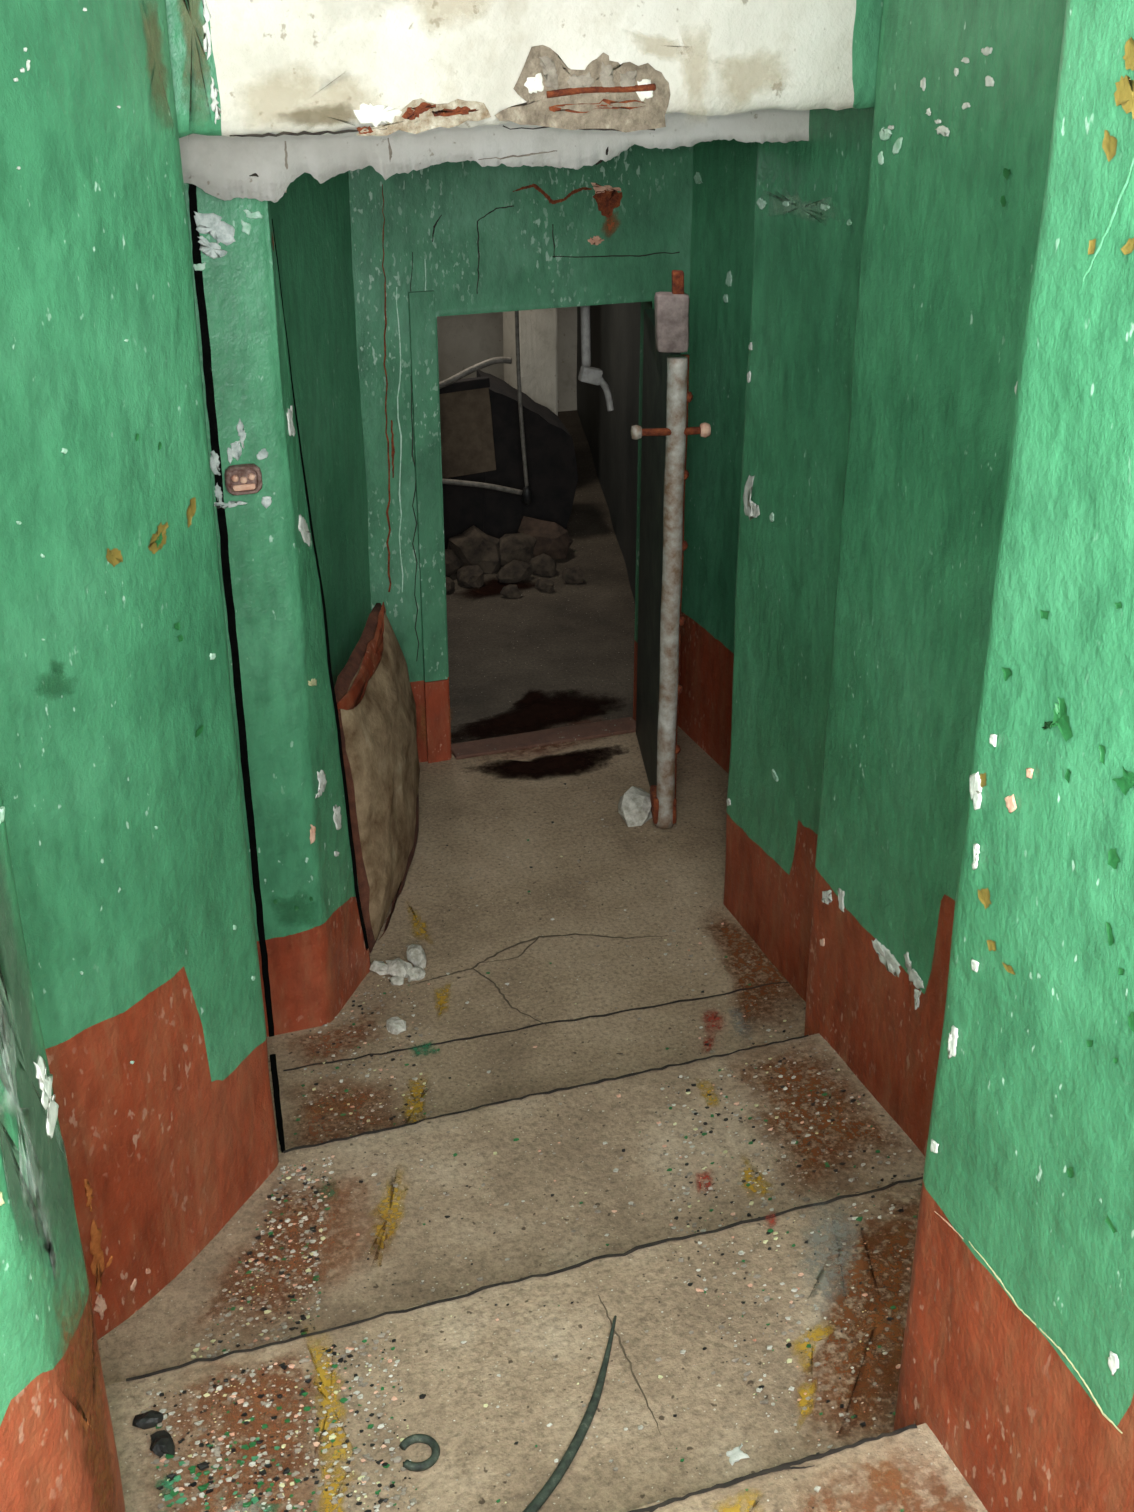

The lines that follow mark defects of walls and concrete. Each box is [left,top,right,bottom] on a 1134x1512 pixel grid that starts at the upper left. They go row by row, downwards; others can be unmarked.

spalling [353,45,671,136]
peeling [920,77,950,137]
peeling [1114,37,1134,119]
corrosion [588,183,623,245]
spalling [210,419,272,509]
spalling [298,515,311,547]
crack [188,125,808,1153]
spalling [315,770,342,830]
spalling [969,772,986,810]
spalling [972,843,980,870]
peeling [872,939,924,1010]
spalling [947,1025,958,1059]